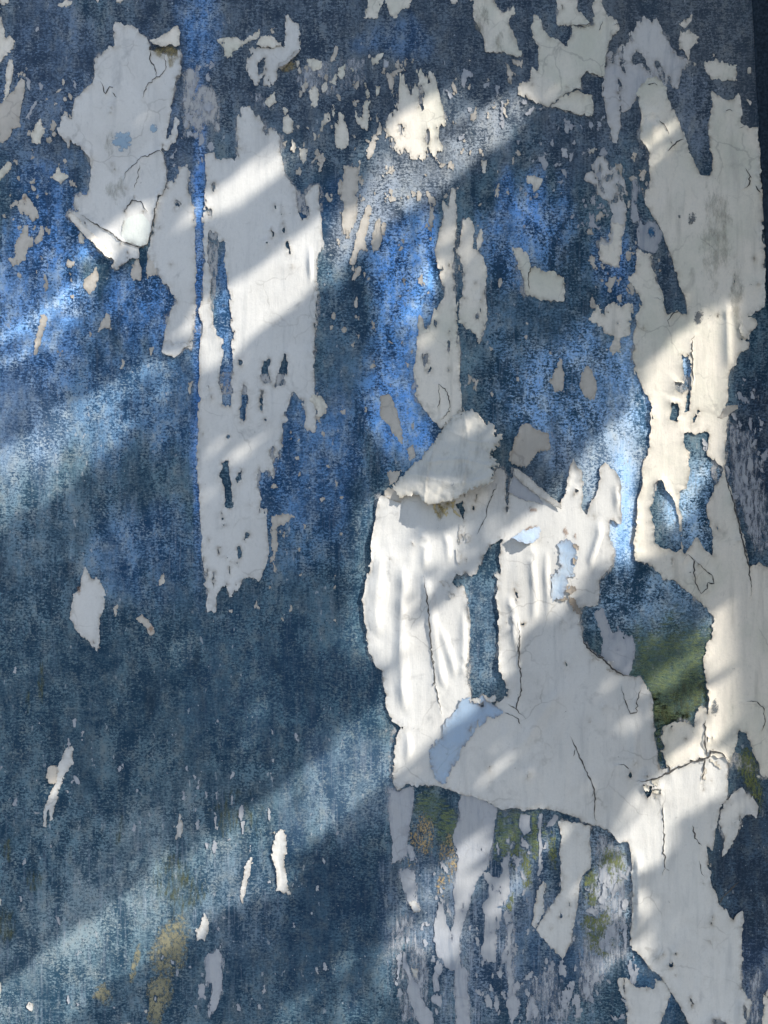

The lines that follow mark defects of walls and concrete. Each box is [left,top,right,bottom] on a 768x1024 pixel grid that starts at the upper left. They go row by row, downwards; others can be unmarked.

crack [144,52,166,92]
crack [82,150,162,247]
peeling [0,15,487,622]
peeling [362,0,768,1024]
peeling [70,567,118,651]
peeling [136,614,155,635]
crack [571,738,596,818]
crack [621,720,729,782]
damp [649,658,718,759]
peeling [205,796,253,855]
peeling [268,808,291,895]
damp [408,807,457,897]